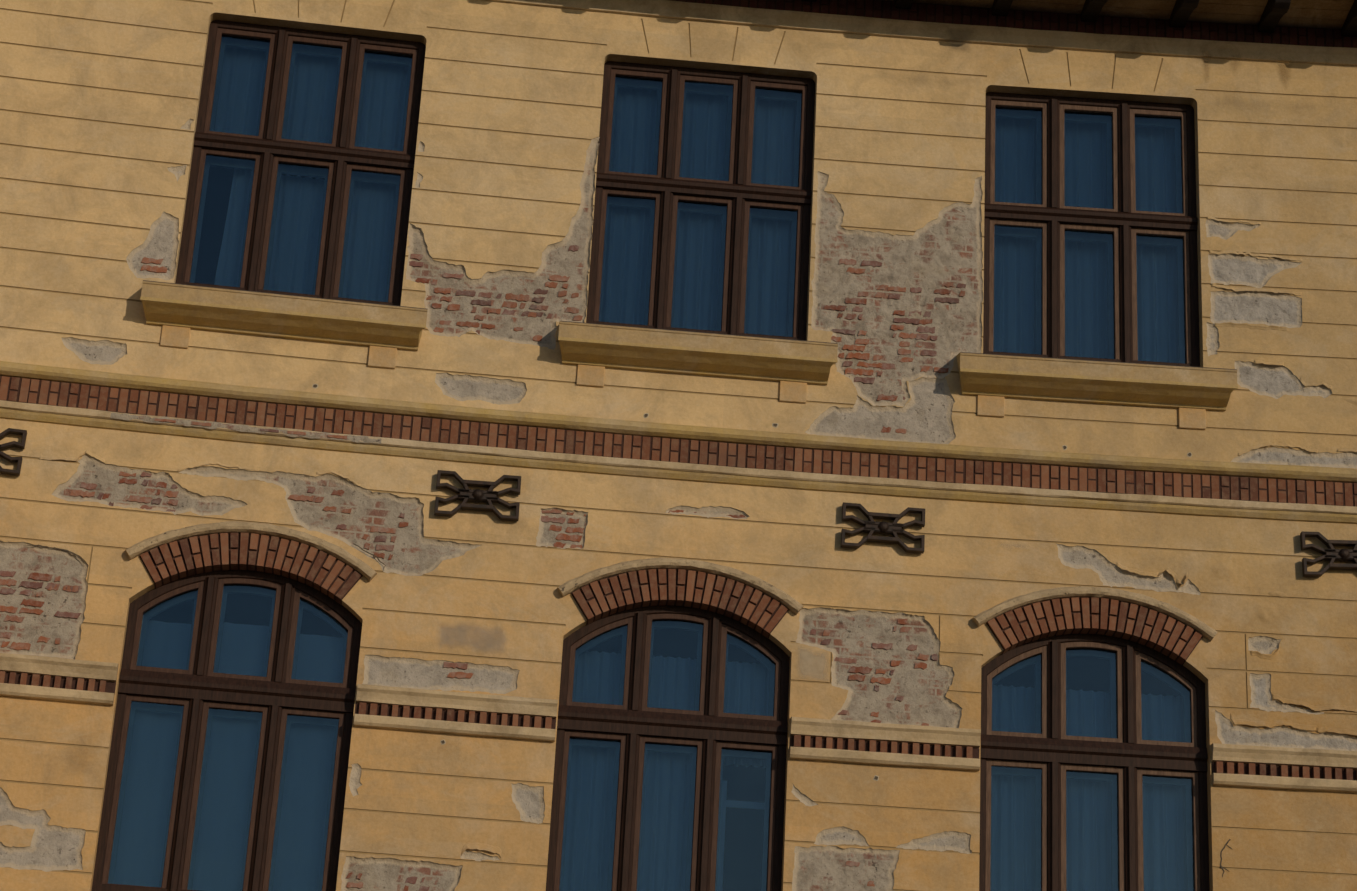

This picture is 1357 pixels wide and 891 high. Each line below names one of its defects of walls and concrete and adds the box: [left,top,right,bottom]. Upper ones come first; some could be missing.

spalling [126,212,179,280]
spalling [406,137,600,350]
spalling [806,171,983,444]
spalling [1206,217,1302,356]
spalling [0,541,89,659]
spalling [39,450,481,576]
spalling [536,508,588,549]
peeling [1056,544,1200,595]
spalling [796,608,962,728]
spalling [1215,636,1357,751]
peeling [0,787,86,872]
spalling [792,827,972,891]